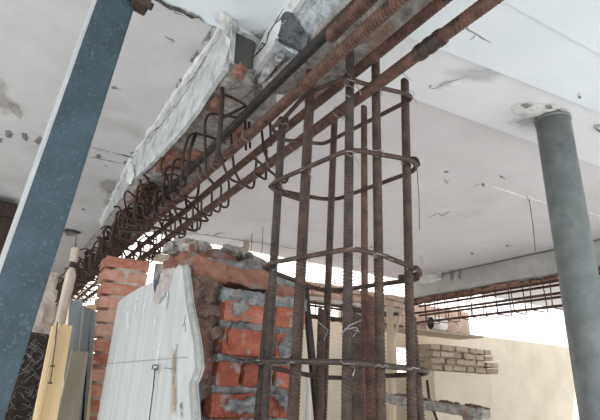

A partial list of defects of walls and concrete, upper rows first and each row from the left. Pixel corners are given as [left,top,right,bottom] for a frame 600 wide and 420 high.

flaking render [202,11,266,75]
spalling [257,11,308,83]
spalling [511,102,567,118]
flaking render [123,151,153,202]
flaking render [155,148,201,172]
peeling [153,268,174,304]